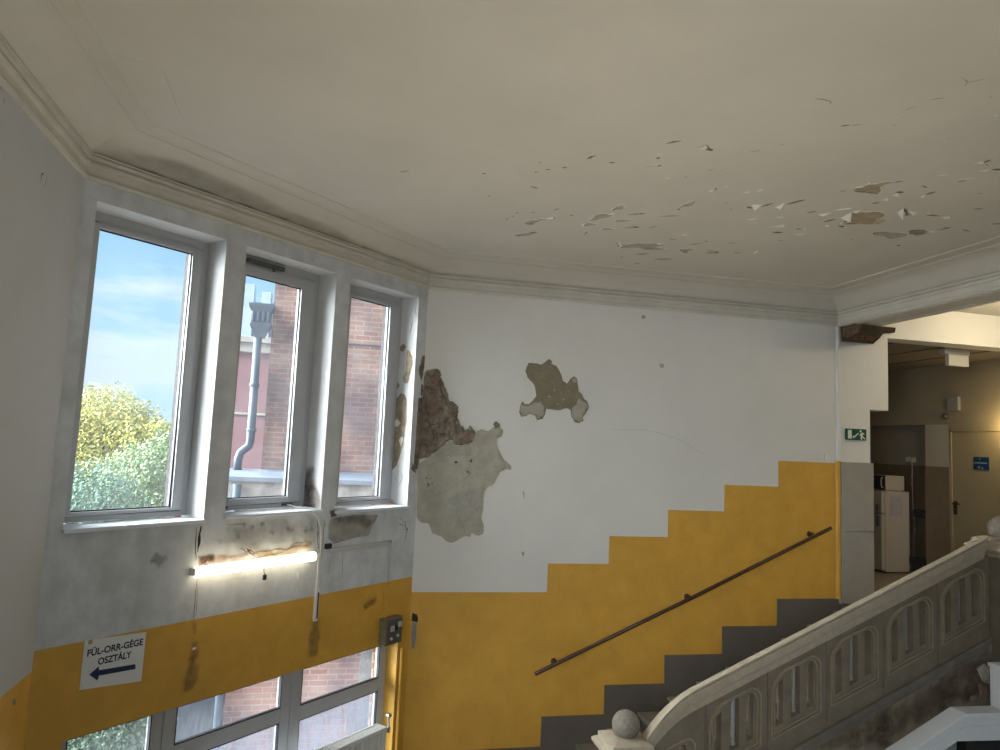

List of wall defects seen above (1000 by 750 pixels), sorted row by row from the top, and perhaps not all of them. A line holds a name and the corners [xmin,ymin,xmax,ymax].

peeling [616,234,720,264]
peeling [747,199,806,241]
peeling [807,181,970,246]
peeling [392,305,512,543]
peeling [519,359,589,424]